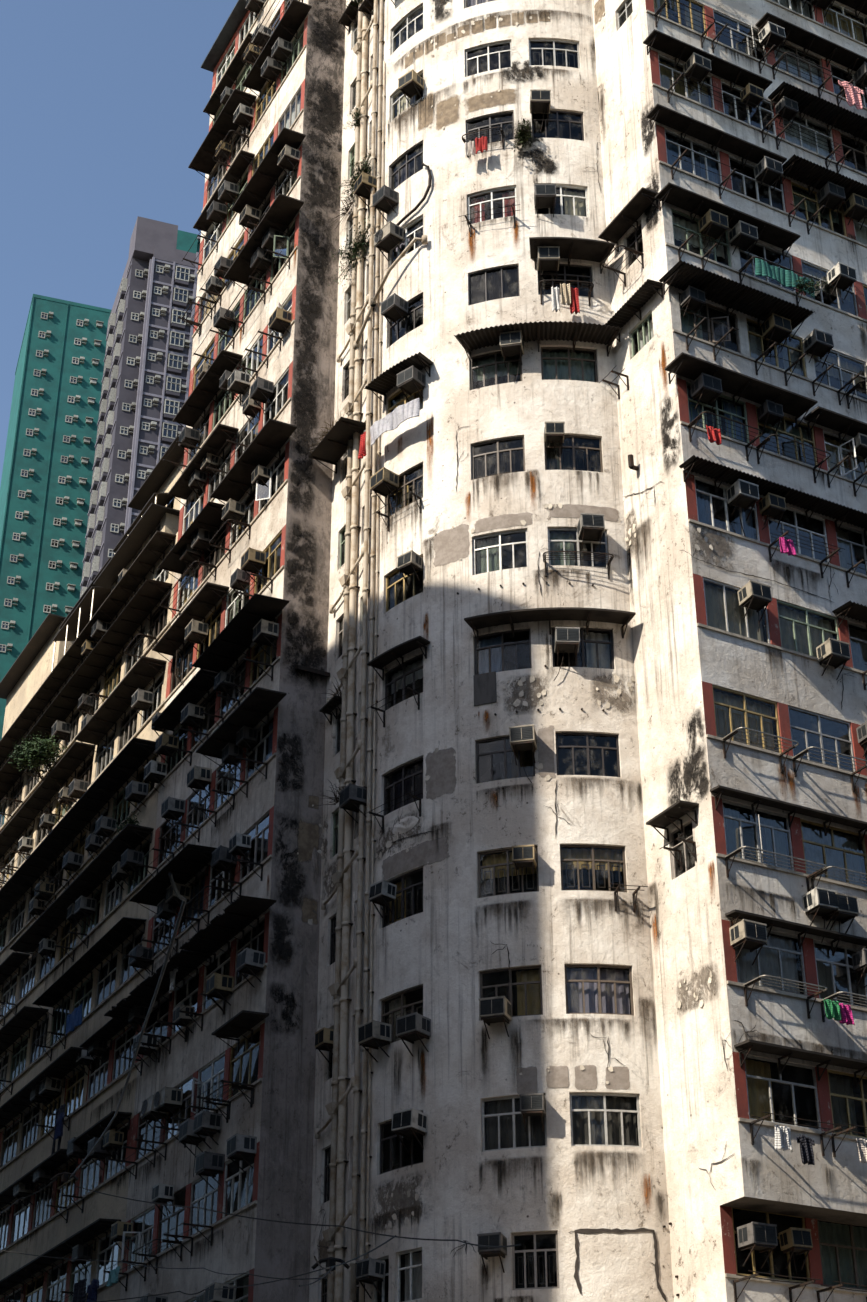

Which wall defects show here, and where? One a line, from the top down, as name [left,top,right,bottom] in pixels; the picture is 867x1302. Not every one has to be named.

leakage [397,0,591,64]
leakage [474,123,557,183]
leakage [284,80,342,684]
leakage [661,397,680,469]
spalling [433,503,637,566]
peeling [502,675,546,712]
peeling [593,675,635,712]
leakage [277,734,304,791]
spalling [425,745,456,800]
leakage [668,710,709,805]
spalling [375,814,455,881]
peeling [675,966,718,1012]